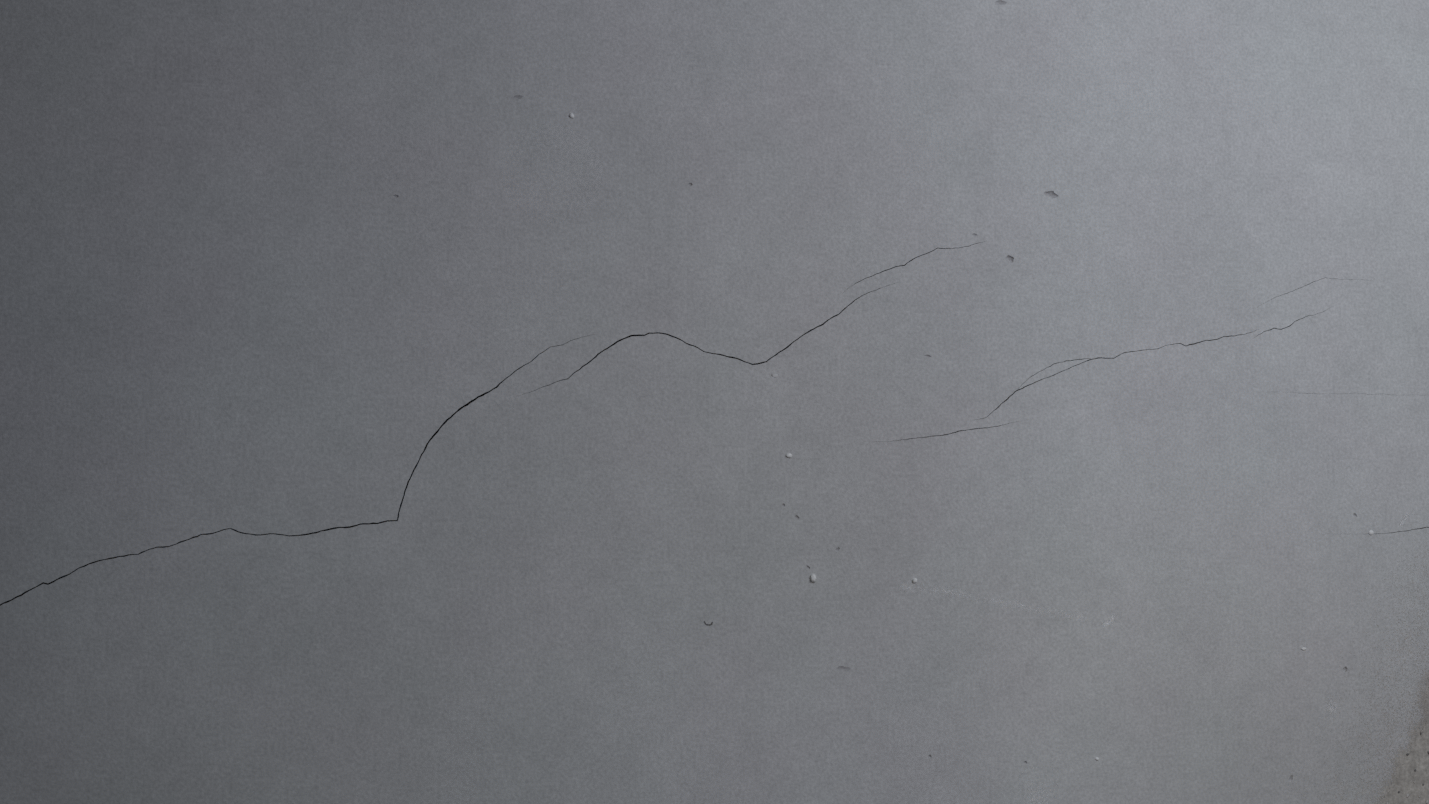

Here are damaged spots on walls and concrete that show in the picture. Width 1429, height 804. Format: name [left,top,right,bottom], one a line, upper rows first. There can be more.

crack [0,241,985,606]
crack [890,278,1357,442]